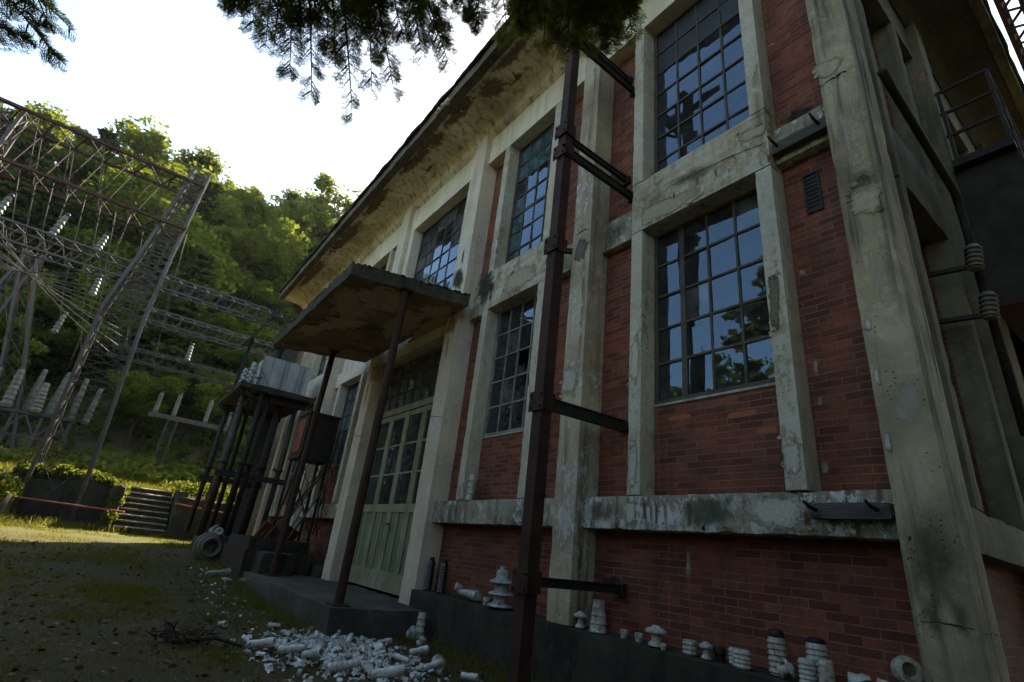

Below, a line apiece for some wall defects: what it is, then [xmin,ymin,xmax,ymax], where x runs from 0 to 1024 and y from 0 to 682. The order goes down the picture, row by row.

crack [649,145,760,203]
leakage [644,504,667,522]